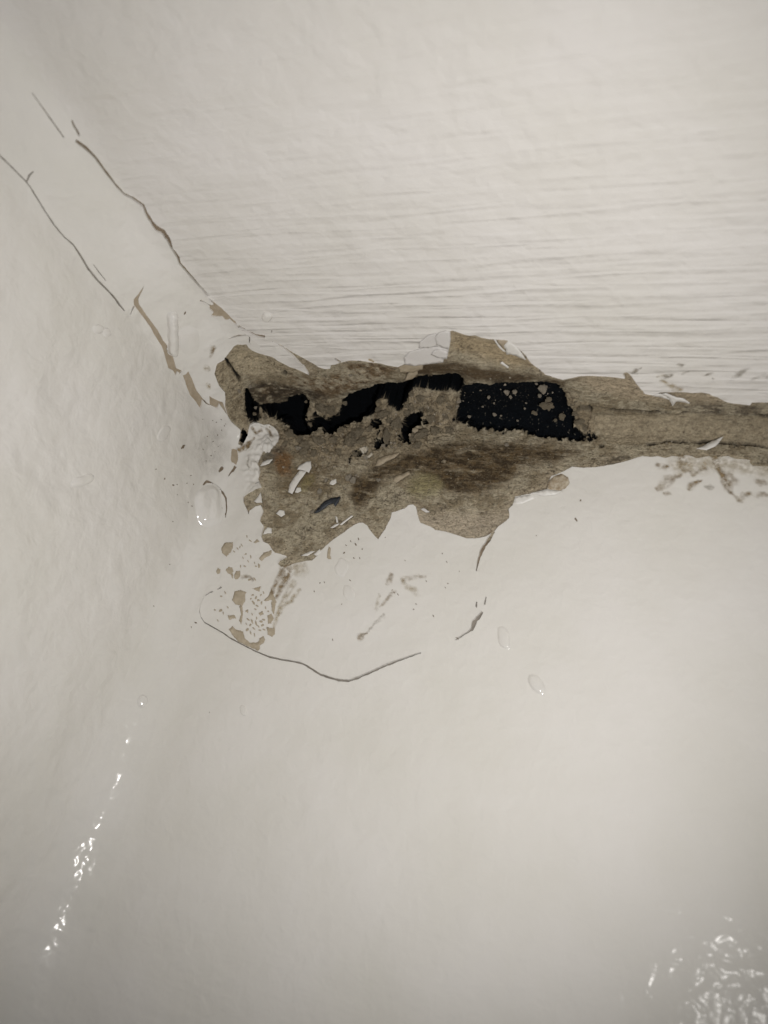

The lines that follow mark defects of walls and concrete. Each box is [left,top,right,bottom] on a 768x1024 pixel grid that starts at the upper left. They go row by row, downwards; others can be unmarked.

crack [0,156,123,310]
crack [32,93,206,292]
flaking render [214,331,768,651]
crack [201,617,421,682]
crack [456,599,486,640]